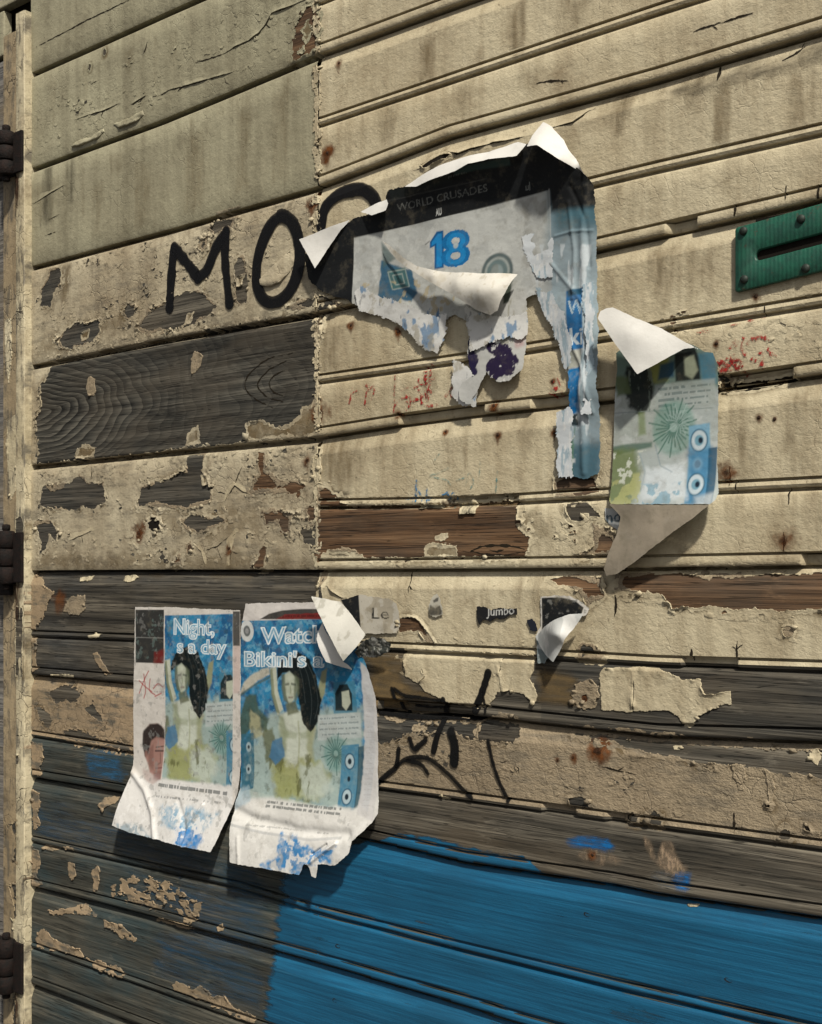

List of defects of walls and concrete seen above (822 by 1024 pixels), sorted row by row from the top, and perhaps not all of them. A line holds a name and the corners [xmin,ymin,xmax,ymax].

crack [40,0,128,45]
crack [74,0,304,120]
peeling [286,0,325,71]
peeling [15,198,822,643]
peeling [370,614,535,706]
peeling [32,677,134,756]
peeling [377,709,531,798]
corrosion [588,738,611,764]
peeling [561,716,822,790]
peeling [565,793,596,814]
peeling [625,805,667,831]
peeling [773,819,816,844]